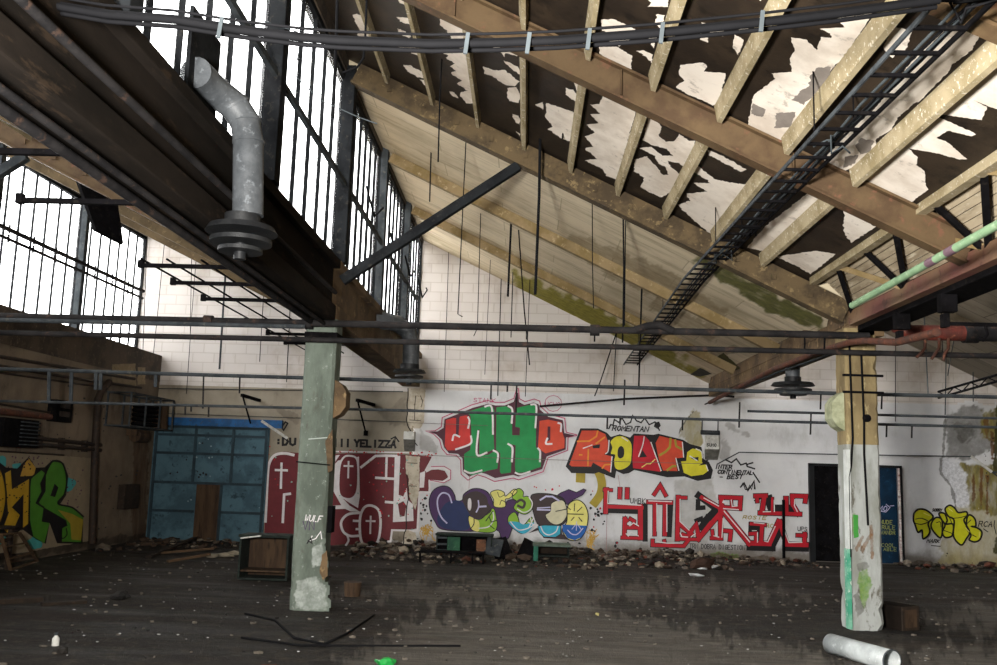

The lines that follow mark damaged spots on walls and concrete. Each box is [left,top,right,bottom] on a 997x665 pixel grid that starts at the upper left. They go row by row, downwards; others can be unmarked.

peeling [535,83,578,141]
peeling [585,97,635,179]
peeling [599,19,655,69]
peeling [634,118,695,197]
peeling [676,63,726,106]
peeling [678,149,746,233]
peeling [748,13,872,140]
peeling [843,211,875,243]
peeling [824,27,979,170]
peeling [866,68,997,202]
damp [558,224,734,347]
damp [930,400,997,565]